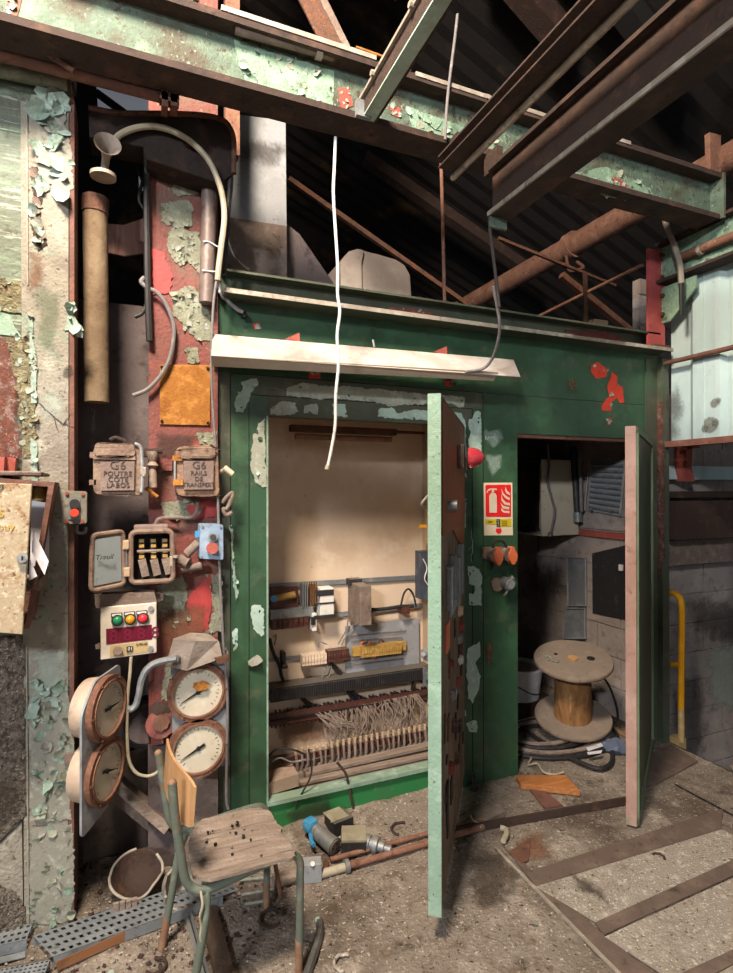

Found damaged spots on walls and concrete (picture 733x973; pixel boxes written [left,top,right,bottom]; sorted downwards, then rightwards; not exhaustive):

peeling [23,85,75,251]
peeling [151,184,211,364]
corrosion [0,337,22,458]
spalling [0,277,39,481]
peeling [24,676,76,931]